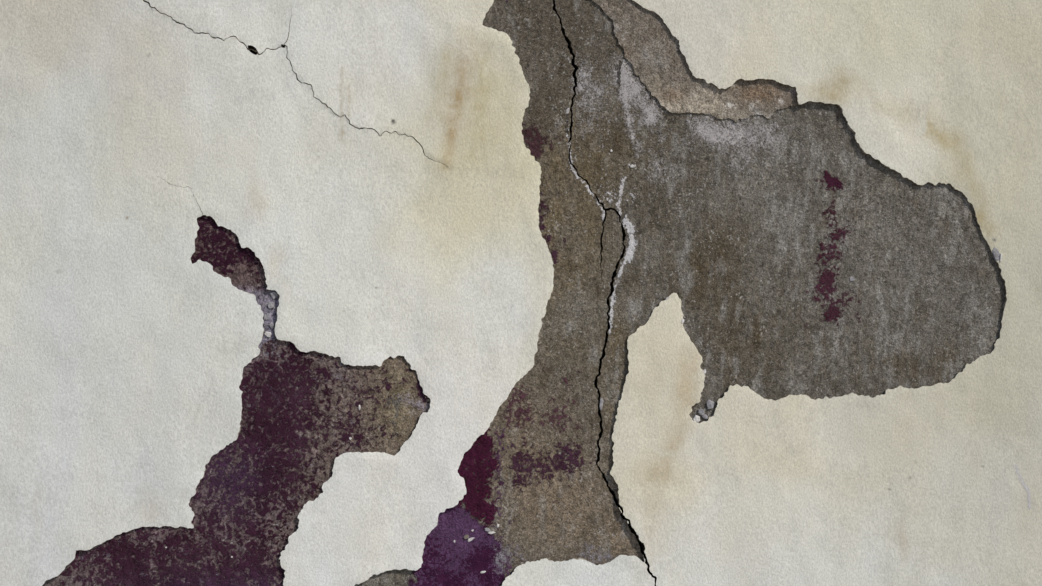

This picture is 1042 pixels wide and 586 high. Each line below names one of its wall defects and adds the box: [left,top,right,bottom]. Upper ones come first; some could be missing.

peeling [43,216,431,586]
crack [143,0,448,167]
crack [553,0,657,586]
peeling [453,0,1005,586]